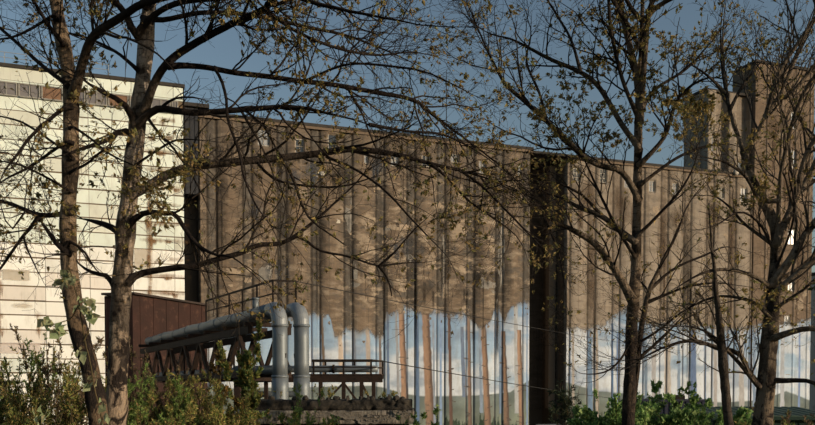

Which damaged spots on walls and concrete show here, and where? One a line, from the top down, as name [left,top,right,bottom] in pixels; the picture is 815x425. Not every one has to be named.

leakage [496,263,508,339]